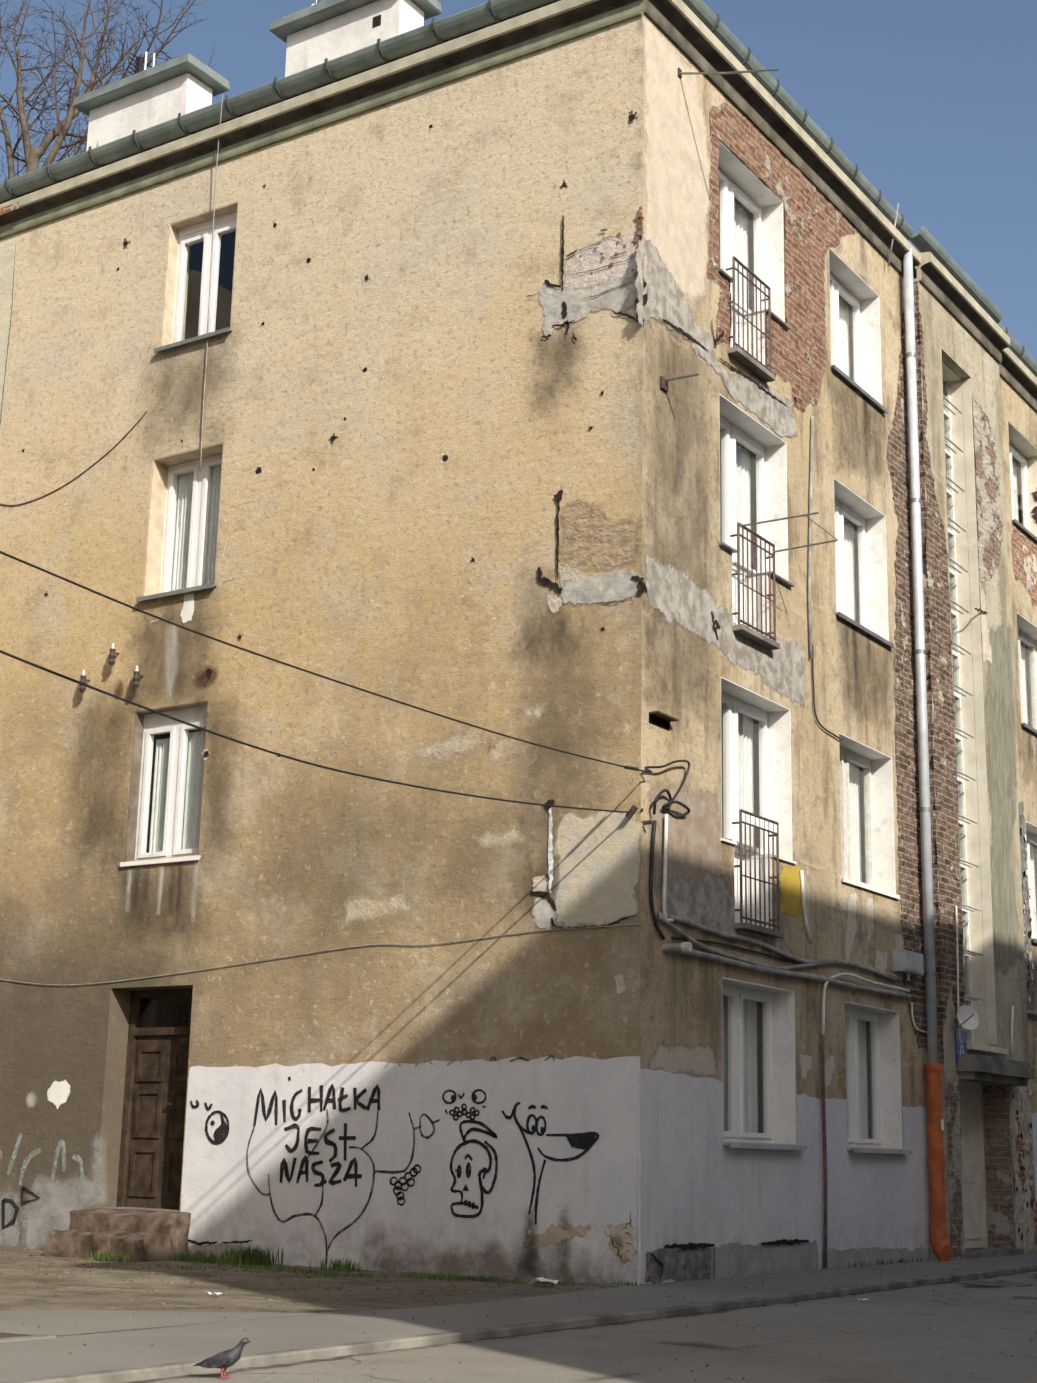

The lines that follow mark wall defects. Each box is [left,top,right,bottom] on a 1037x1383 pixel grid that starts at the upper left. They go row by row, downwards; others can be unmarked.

spalling [563,206,648,323]
spalling [707,103,857,412]
peeling [541,320,577,341]
crack [537,490,563,595]
spalling [547,500,646,614]
spalling [972,397,1037,664]
spalling [845,281,965,1259]
spalling [532,809,643,932]
spalling [1018,801,1034,1024]
spalling [983,1085,1037,1254]
spalling [519,1212,637,1265]